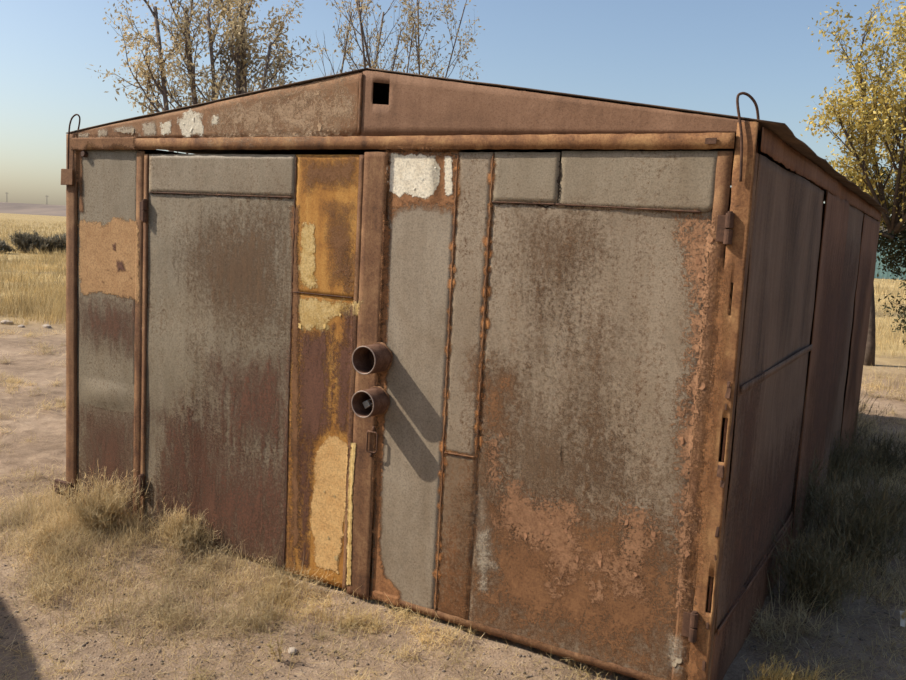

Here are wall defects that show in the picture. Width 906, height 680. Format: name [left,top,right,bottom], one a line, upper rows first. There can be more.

rust [303,156,358,190]
peeling [388,153,453,199]
rust [511,201,672,376]
rust [267,194,356,567]
rust [457,237,730,680]